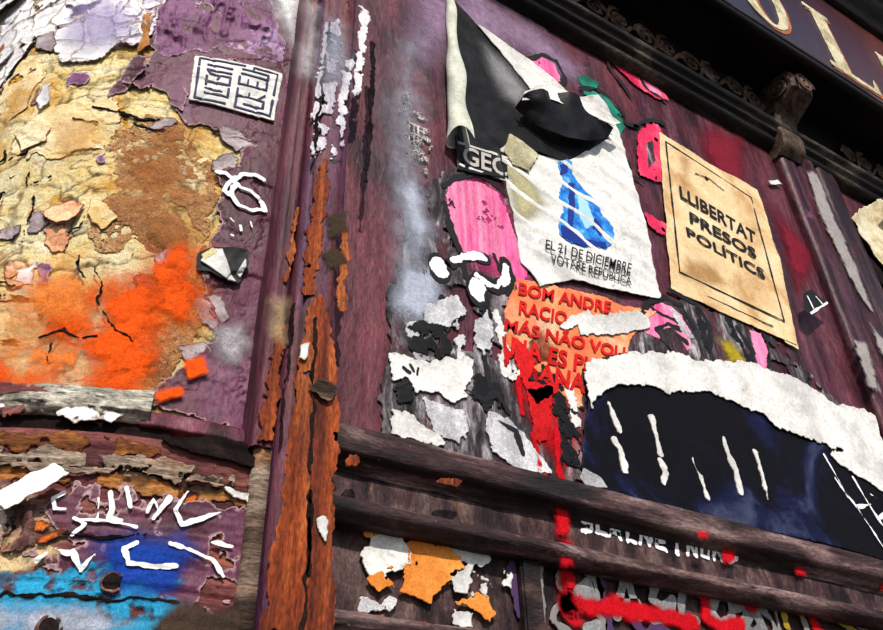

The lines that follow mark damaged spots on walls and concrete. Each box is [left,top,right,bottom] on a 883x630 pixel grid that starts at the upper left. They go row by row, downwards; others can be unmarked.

crack [310,21,331,171]
crack [363,41,376,183]
peeling [0,0,295,441]
crack [0,254,133,361]
peeling [258,5,371,630]
peeling [444,318,466,360]
peeling [478,299,512,378]
peeling [0,402,126,480]
crack [0,414,257,487]
crack [279,303,338,630]
peeling [549,372,582,467]
crack [0,590,180,603]